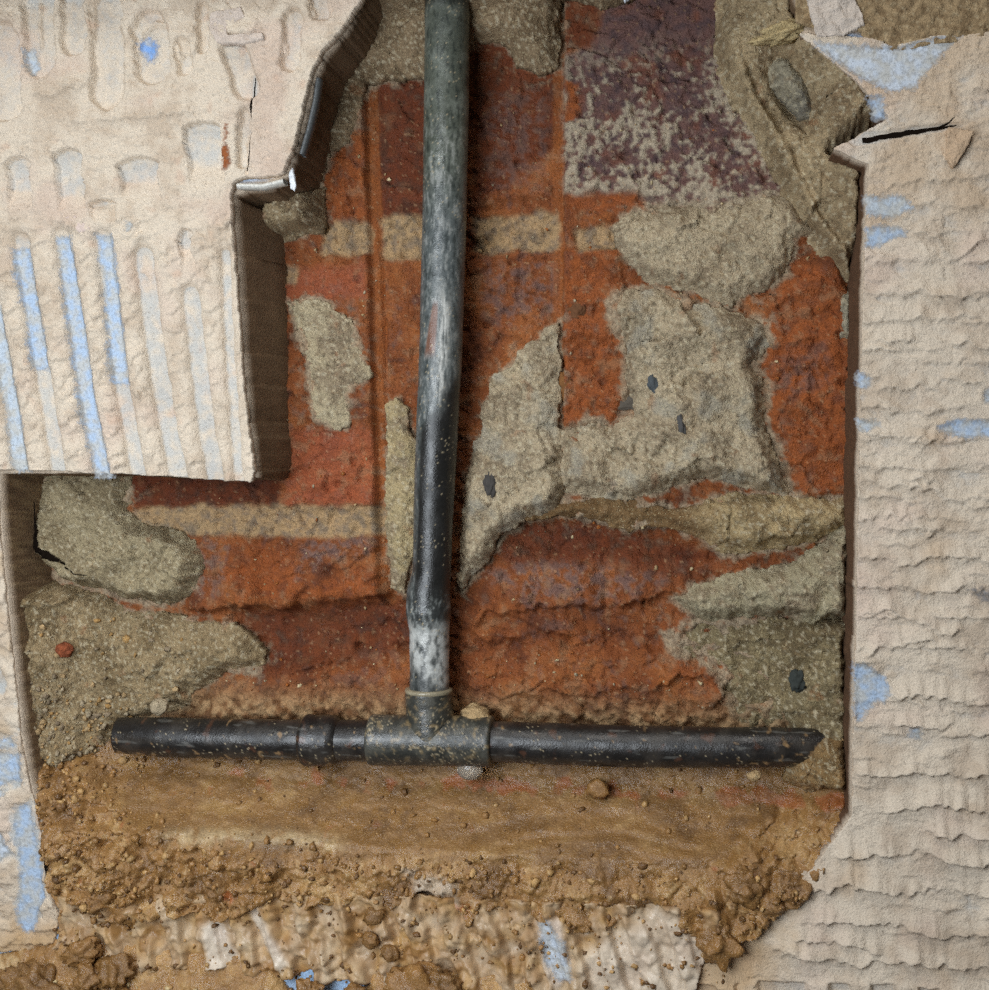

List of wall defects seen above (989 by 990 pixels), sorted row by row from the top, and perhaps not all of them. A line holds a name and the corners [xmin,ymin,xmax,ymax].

peeling [136,37,157,62]
crack [247,78,256,171]
spalling [262,0,425,243]
crack [862,117,956,143]
peeling [0,308,29,472]
peeling [11,247,50,370]
spalling [287,299,374,432]
spalling [456,0,989,793]
spalling [20,215,269,767]
spalling [384,398,416,594]
peeling [0,805,45,931]
peeling [538,920,571,981]